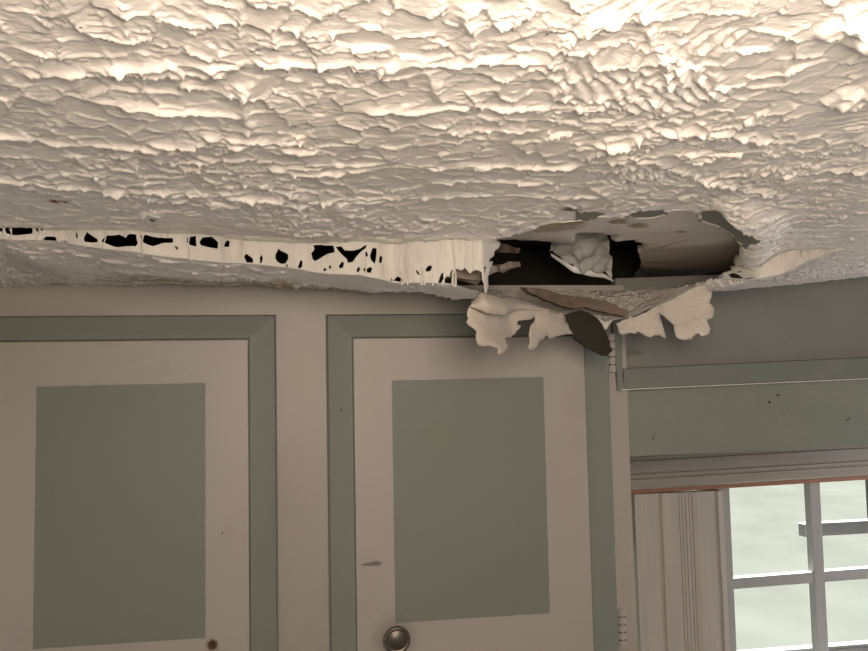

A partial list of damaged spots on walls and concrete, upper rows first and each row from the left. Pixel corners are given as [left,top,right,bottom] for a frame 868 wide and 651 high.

water stain [533,208,583,231]
peeling [574,212,606,222]
peeling [625,209,668,219]
peeling [698,210,761,249]